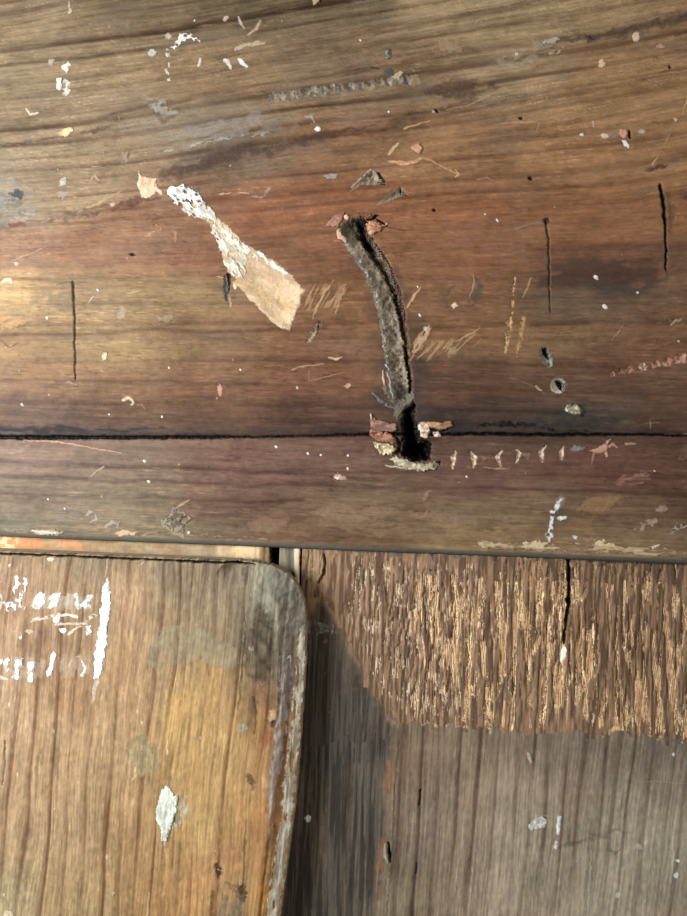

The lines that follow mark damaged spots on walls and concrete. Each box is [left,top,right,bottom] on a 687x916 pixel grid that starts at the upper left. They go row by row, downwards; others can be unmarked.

crack [0,419,687,441]
crack [559,560,574,661]